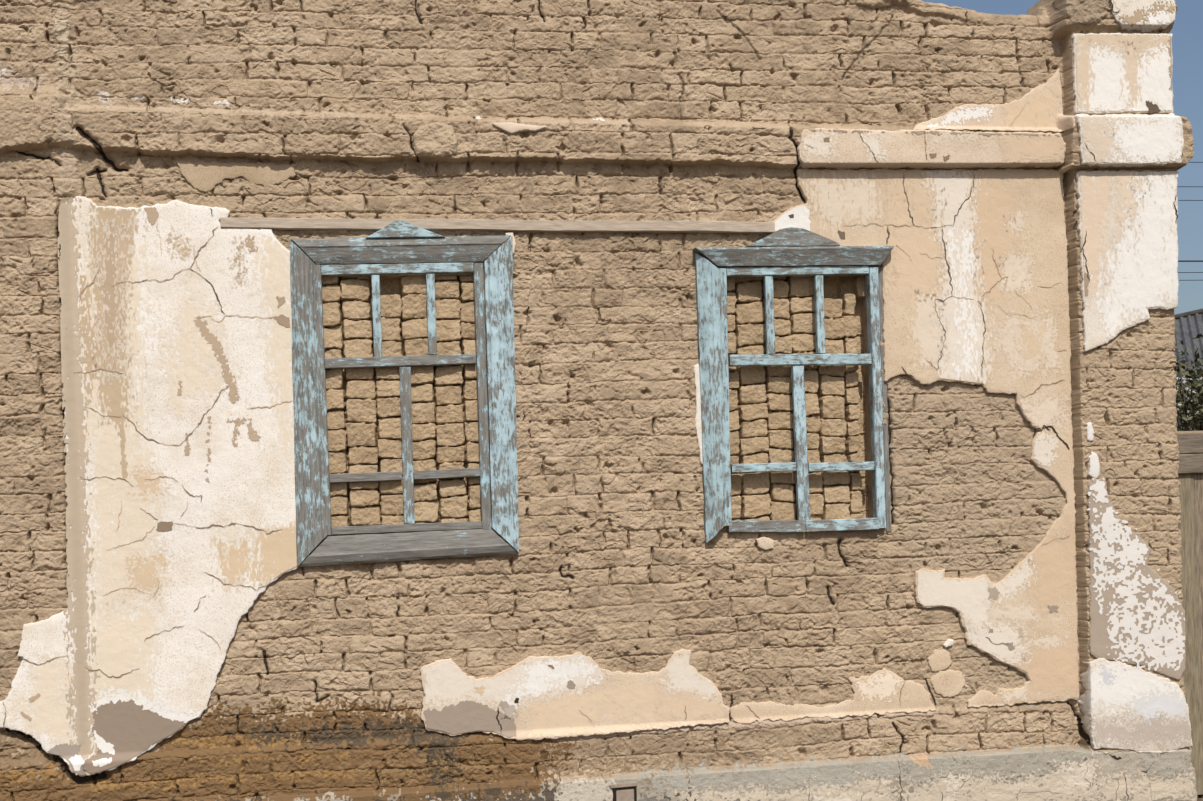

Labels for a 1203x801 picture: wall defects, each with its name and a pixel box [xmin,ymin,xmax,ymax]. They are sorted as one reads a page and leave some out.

peeling [775,129,892,239]
crack [60,208,278,322]
spalling [274,296,290,327]
crack [846,175,1090,379]
spalling [887,0,1186,718]
spalling [156,521,173,532]
crack [62,386,290,550]
water stain [0,196,1192,801]
crack [887,397,895,524]
crack [1034,425,1070,450]
spalling [47,687,201,775]
spalling [422,651,939,743]